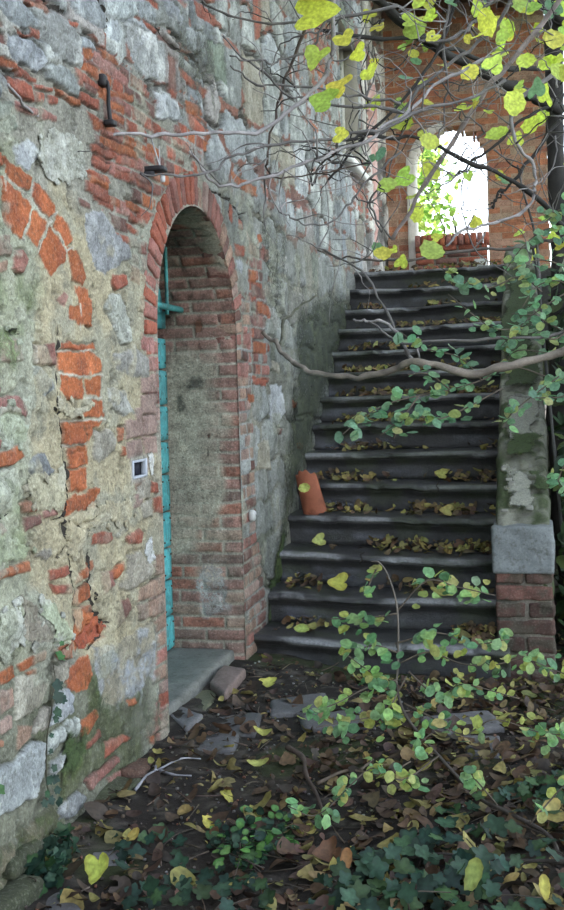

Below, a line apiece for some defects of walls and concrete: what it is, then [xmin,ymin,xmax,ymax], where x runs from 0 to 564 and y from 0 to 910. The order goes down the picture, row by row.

crack [52,327,109,650]
spalling [501,463,534,512]